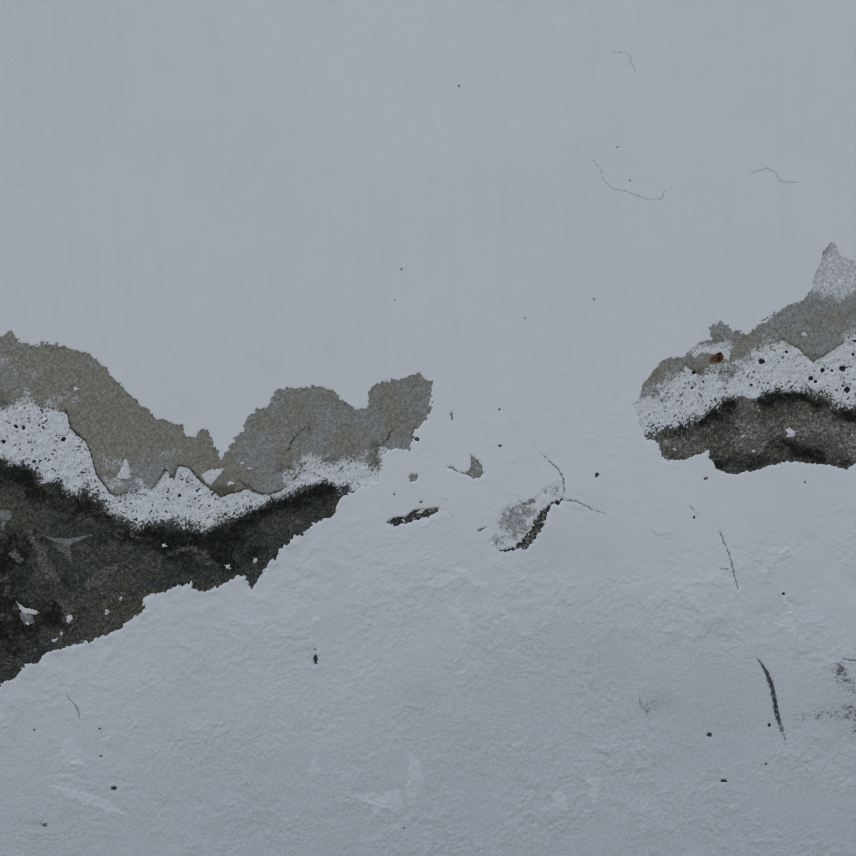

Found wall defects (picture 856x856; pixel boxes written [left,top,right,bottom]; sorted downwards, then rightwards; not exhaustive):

peeling [634,243,856,474]
peeling [448,455,484,479]
peeling [0,331,439,687]
flaking render [493,487,563,552]
crack [759,660,786,740]